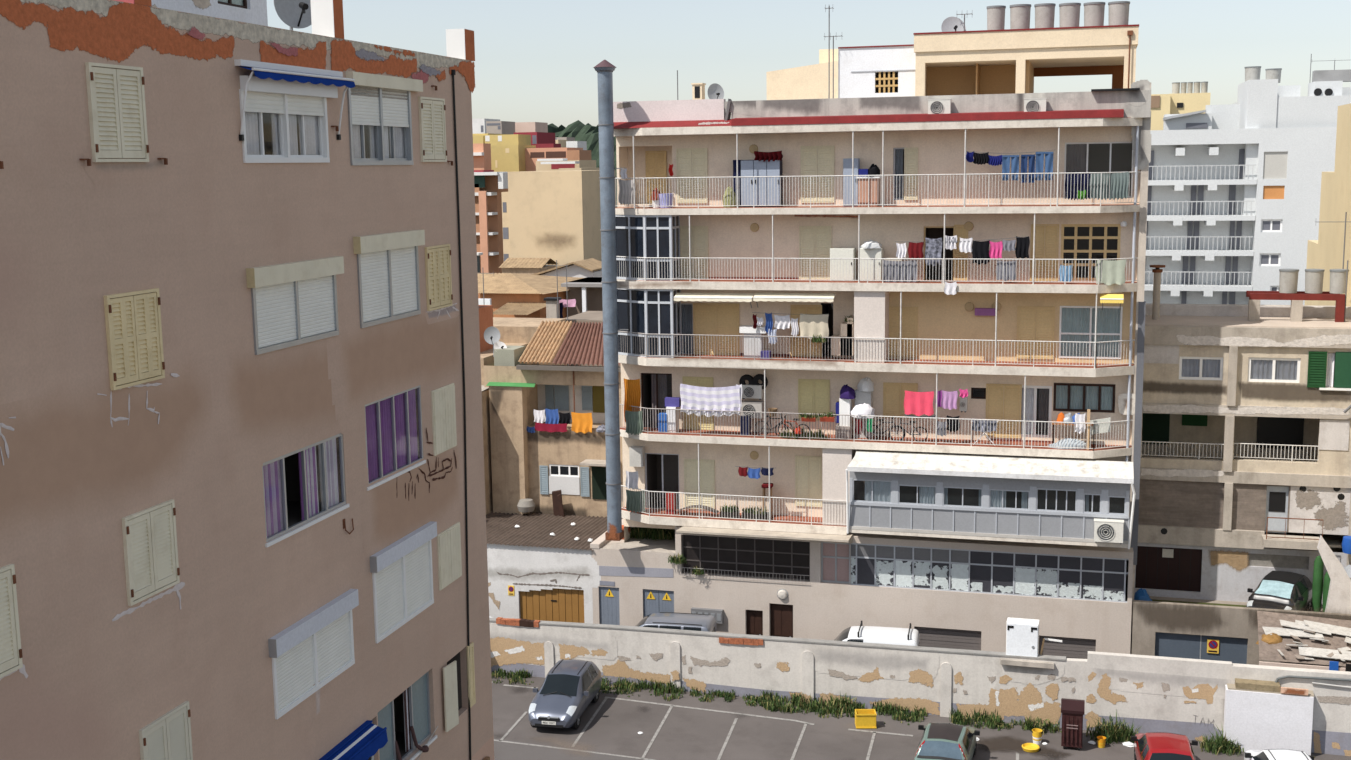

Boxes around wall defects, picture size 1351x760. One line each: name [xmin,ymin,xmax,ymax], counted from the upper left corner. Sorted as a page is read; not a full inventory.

peeling [0,0,476,93]
crack [97,373,179,427]
crack [0,417,16,465]
crack [396,428,457,498]
peeling [1295,486,1349,530]
flaking render [488,583,763,692]
flaking render [754,662,790,672]
flaking render [828,667,940,715]
flaking render [952,672,1143,728]
flaking render [1161,682,1218,704]